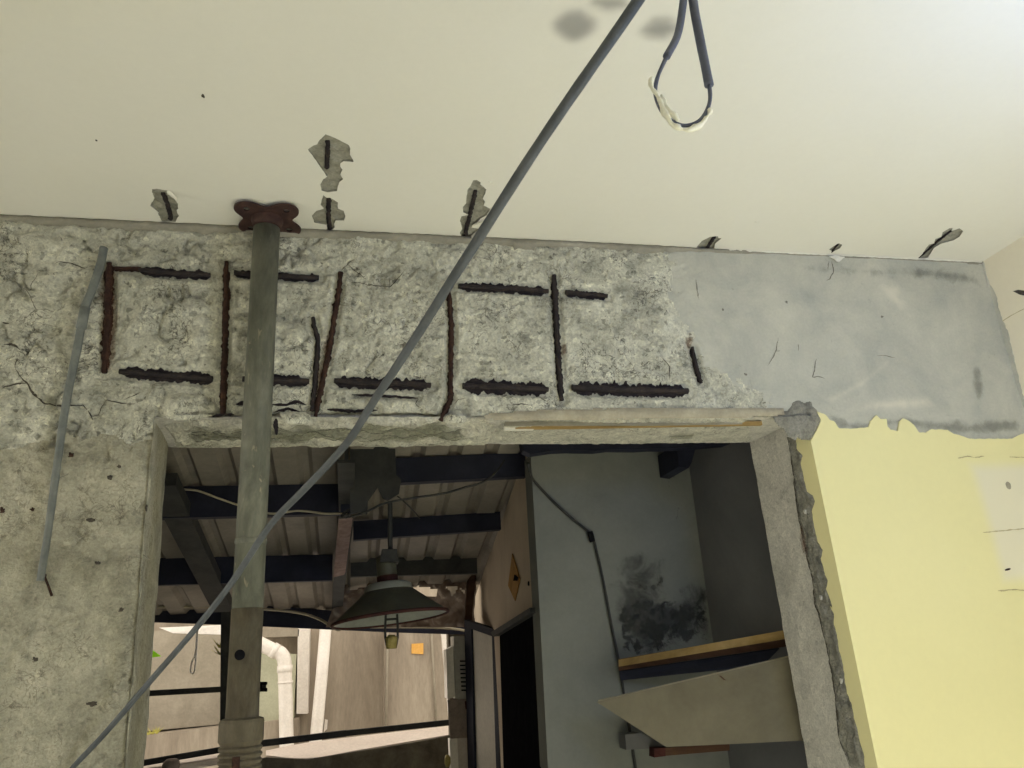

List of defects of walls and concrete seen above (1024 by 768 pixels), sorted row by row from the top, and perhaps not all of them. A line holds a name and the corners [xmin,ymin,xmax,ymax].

crack [3,261,138,420]
peeling [0,189,253,768]
spalling [271,134,1024,448]
mould [620,557,705,653]
flaking render [787,437,865,768]